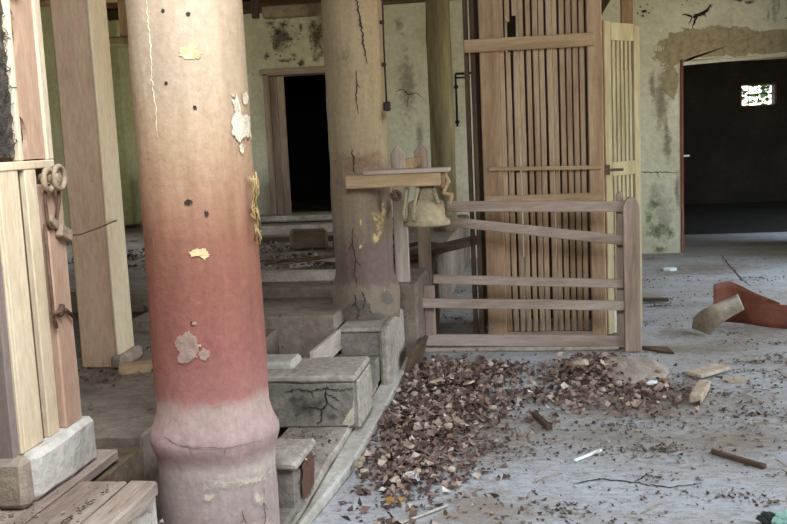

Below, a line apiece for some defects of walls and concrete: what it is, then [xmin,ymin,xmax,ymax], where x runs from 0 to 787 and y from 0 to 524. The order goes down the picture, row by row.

leakage [265,17,324,66]
crack [355,0,367,111]
crack [665,4,711,49]
spalling [648,3,787,100]
peeling [231,92,252,153]
spalling [188,248,210,260]
spalling [175,322,210,363]
crack [286,385,353,424]